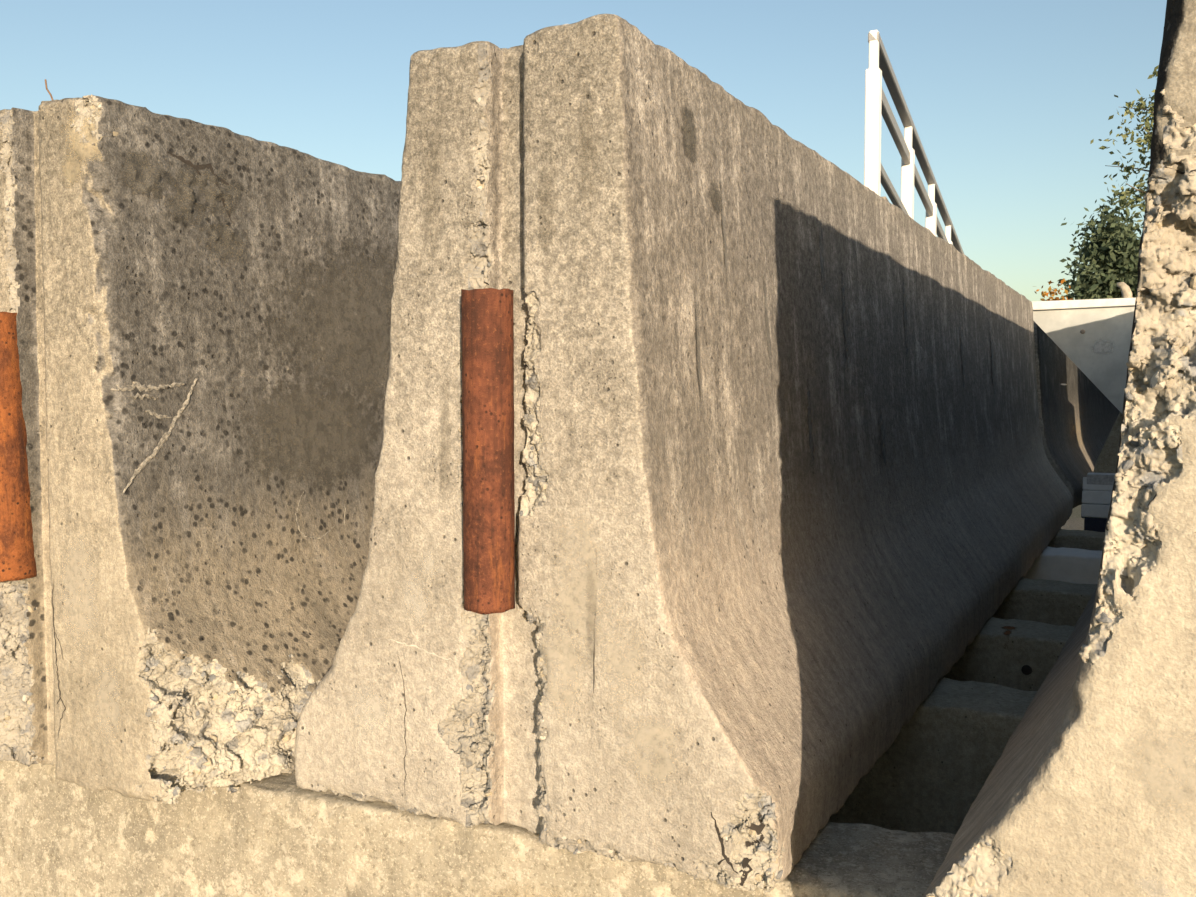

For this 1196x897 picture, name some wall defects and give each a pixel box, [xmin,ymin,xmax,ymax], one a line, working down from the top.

spalling [0,110,20,314]
spalling [465,43,493,290]
spalling [454,353,463,513]
spalling [1078,89,1196,665]
spalling [0,581,44,767]
spalling [135,627,320,804]
spalling [437,588,496,827]
spalling [523,609,631,862]
spalling [646,786,785,893]